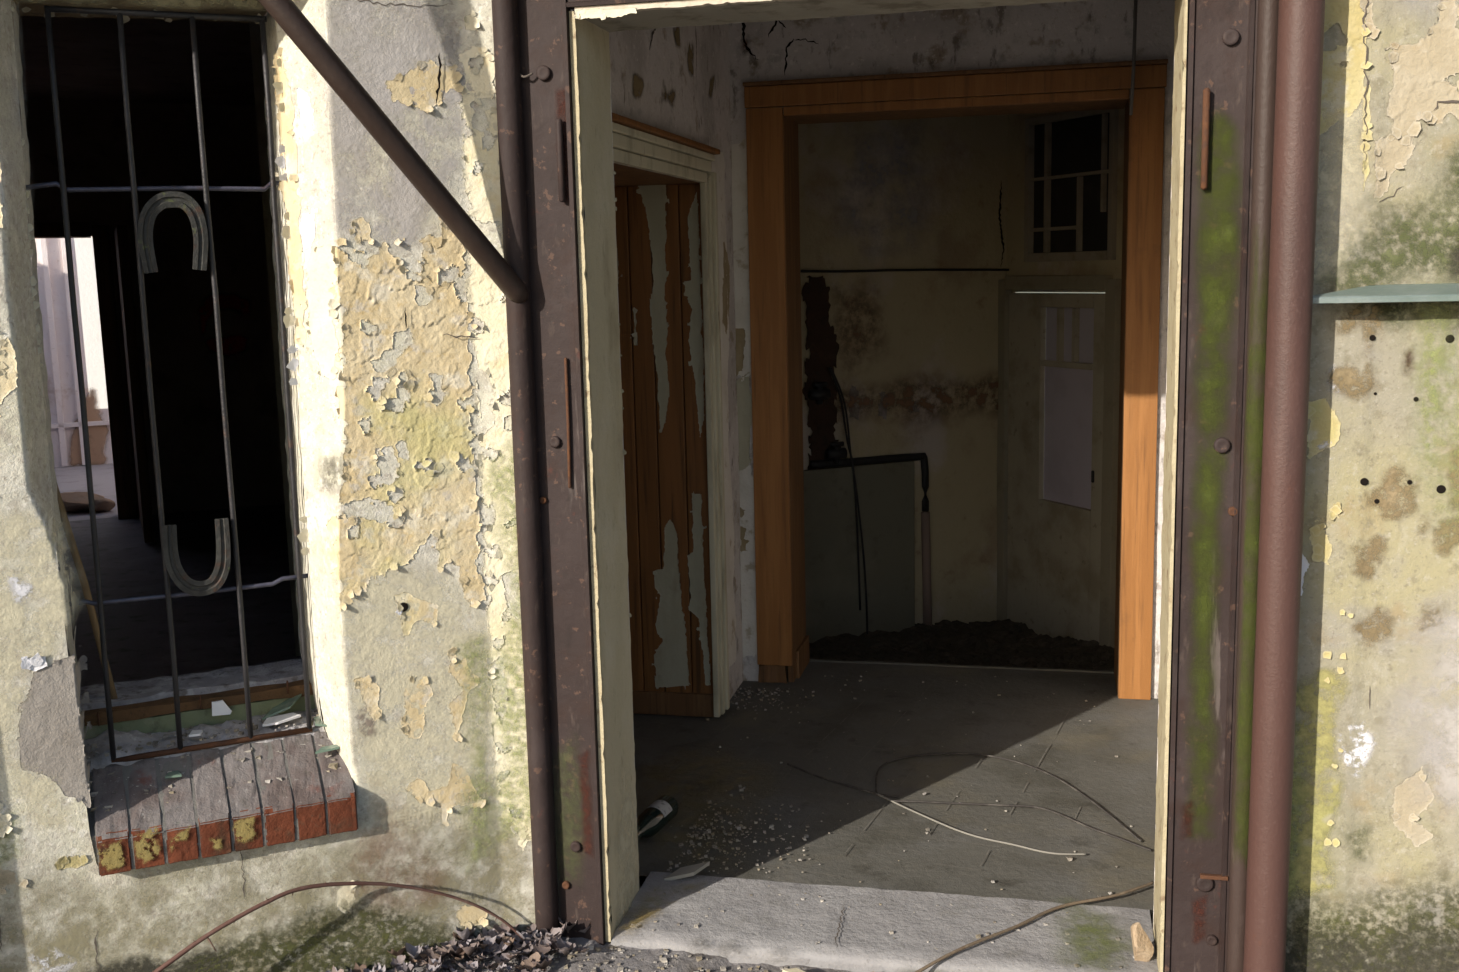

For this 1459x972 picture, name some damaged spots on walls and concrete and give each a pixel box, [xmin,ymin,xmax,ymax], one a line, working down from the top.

peeling [385,10,503,247]
crack [742,20,818,74]
crack [1362,0,1403,202]
peeling [1320,0,1459,198]
peeling [272,47,532,851]
peeling [619,138,757,689]
leakage [0,515,76,749]
spalling [16,626,92,808]
leakage [0,558,524,972]
leakage [1344,725,1373,775]
leakage [1420,706,1459,798]
leakage [1285,939,1459,972]